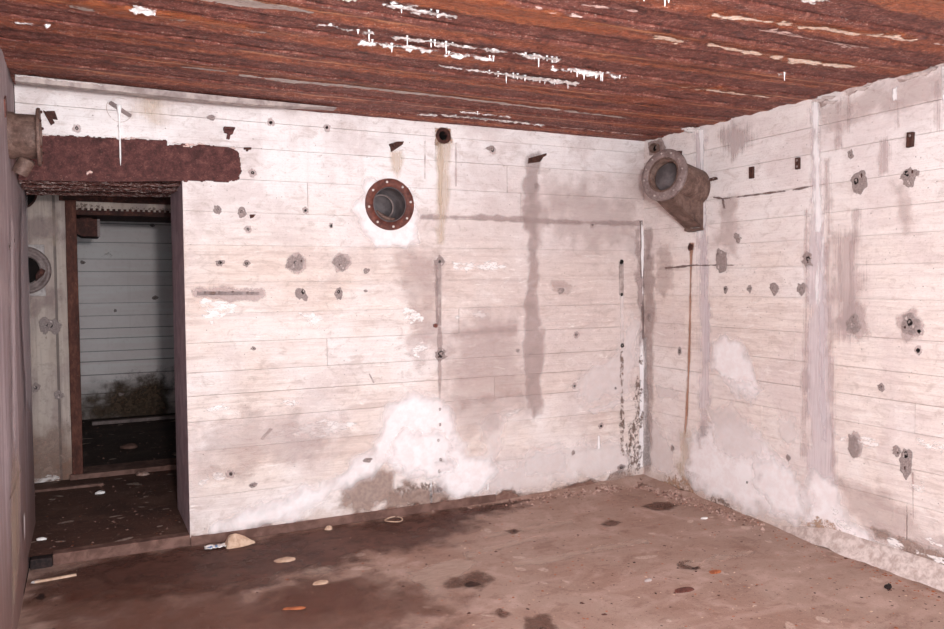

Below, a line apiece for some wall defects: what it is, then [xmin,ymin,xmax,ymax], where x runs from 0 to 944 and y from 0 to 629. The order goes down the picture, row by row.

water stain [419,111,545,127]
spalling [850,170,868,194]
spalling [900,167,920,187]
water stain [353,179,418,247]
rust [685,243,694,434]
water stain [663,98,944,565]
spalling [898,310,923,355]
water stain [34,296,678,629]
spalling [834,431,879,457]
spalling [892,438,944,492]
water stain [678,551,751,570]